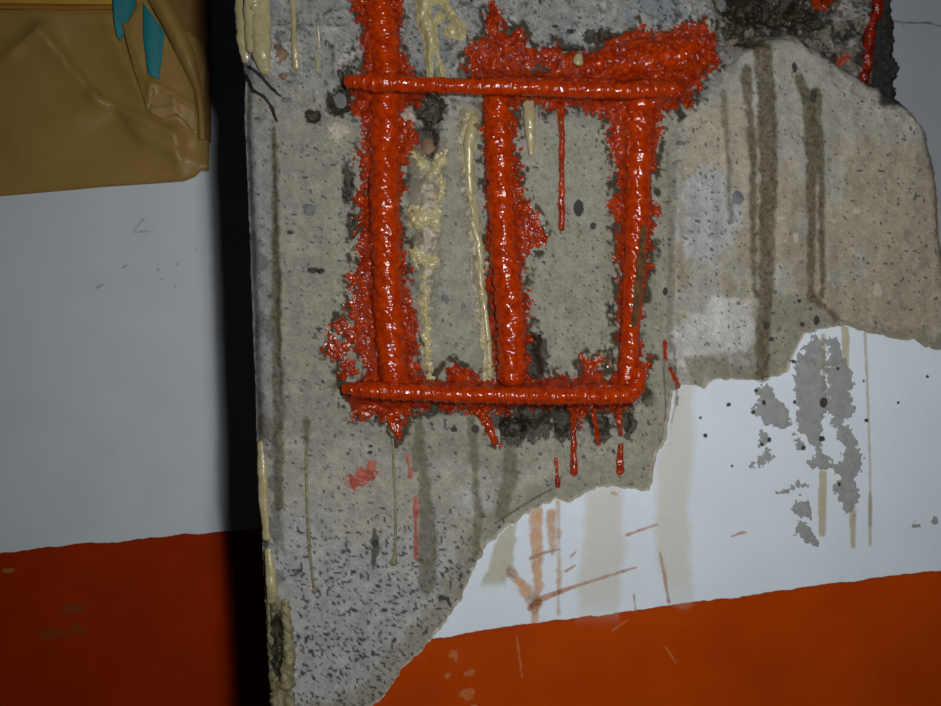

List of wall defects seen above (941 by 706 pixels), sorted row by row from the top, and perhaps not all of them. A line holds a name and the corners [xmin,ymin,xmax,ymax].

spalling [243,0,941,499]
damp [741,42,849,381]
damp [413,421,437,592]
damp [468,411,484,557]
damp [484,440,516,581]
rust [507,501,636,619]